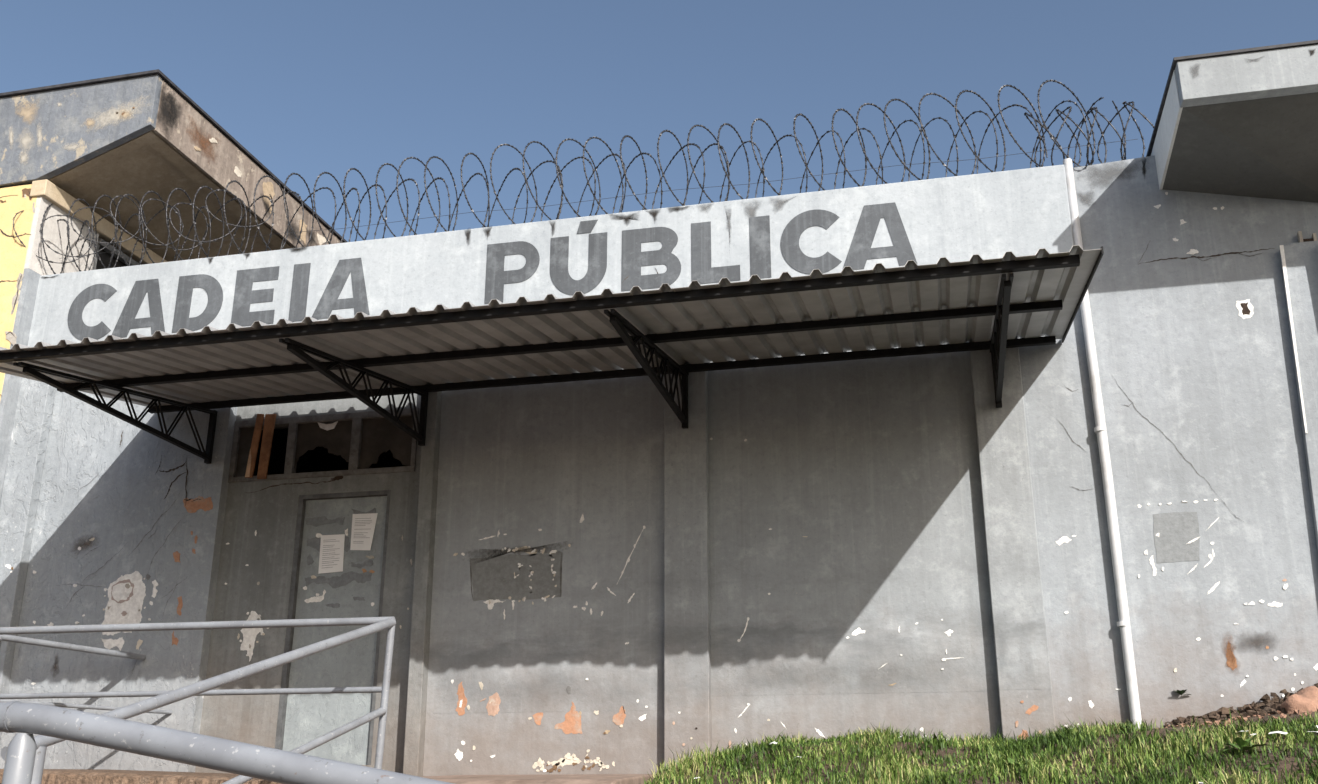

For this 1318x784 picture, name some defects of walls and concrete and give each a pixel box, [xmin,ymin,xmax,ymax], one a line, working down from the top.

peeling [10,104,42,161]
peeling [87,104,135,126]
crack [1139,241,1274,263]
hole [1236,299,1254,319]
crack [1112,376,1241,520]
crack [56,462,188,615]
peeling [470,544,571,620]
peeling [101,571,158,651]
peeling [237,611,269,662]
leakage [1247,637,1293,661]
flaking render [451,680,501,716]
flaking render [528,686,648,734]